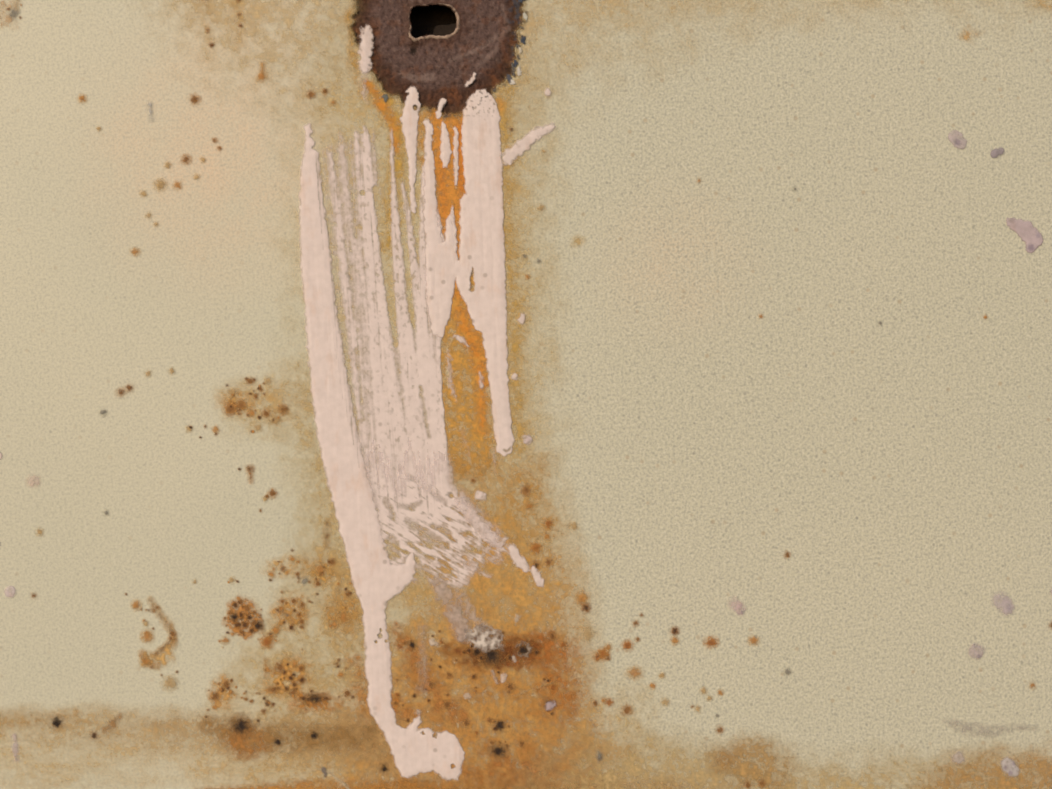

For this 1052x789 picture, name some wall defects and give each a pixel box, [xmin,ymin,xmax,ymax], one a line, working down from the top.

peeling [350,0,527,116]
corrosion [495,88,513,148]
corrosion [308,80,466,326]
corrosion [205,156,631,789]
corrosion [125,593,178,687]
corrosion [935,755,1052,789]